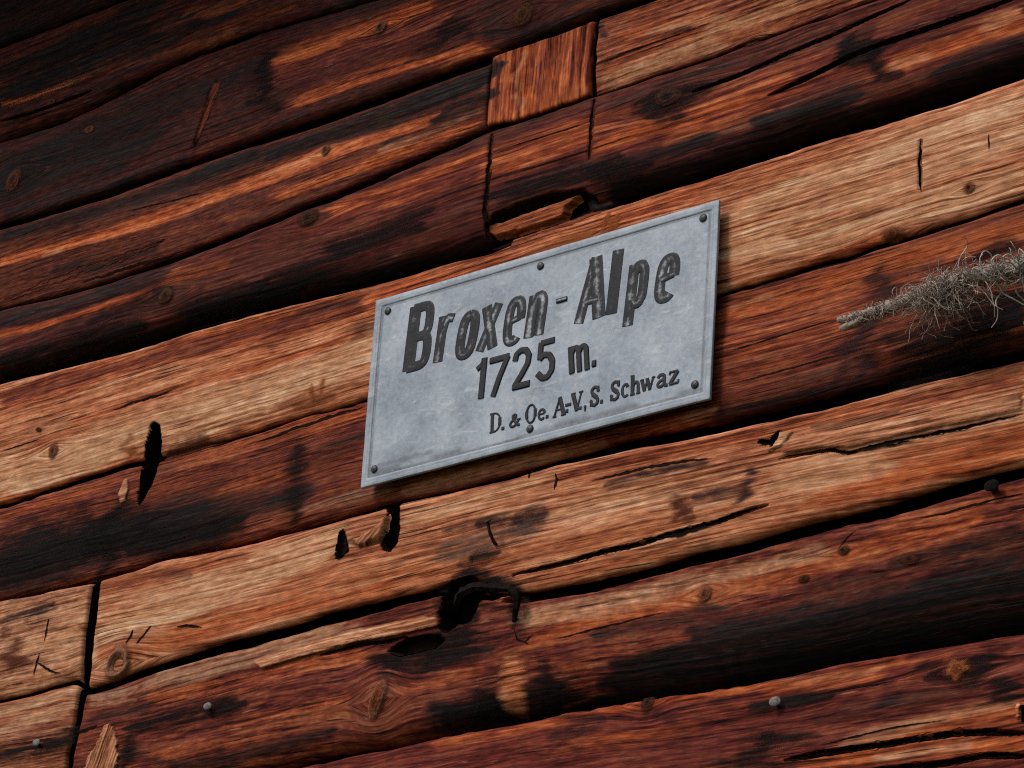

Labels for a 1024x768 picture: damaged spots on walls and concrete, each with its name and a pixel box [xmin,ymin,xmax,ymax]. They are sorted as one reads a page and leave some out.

crack [915,139,923,190]
crack [779,413,1024,459]
crack [513,504,768,576]
crack [783,719,1024,768]